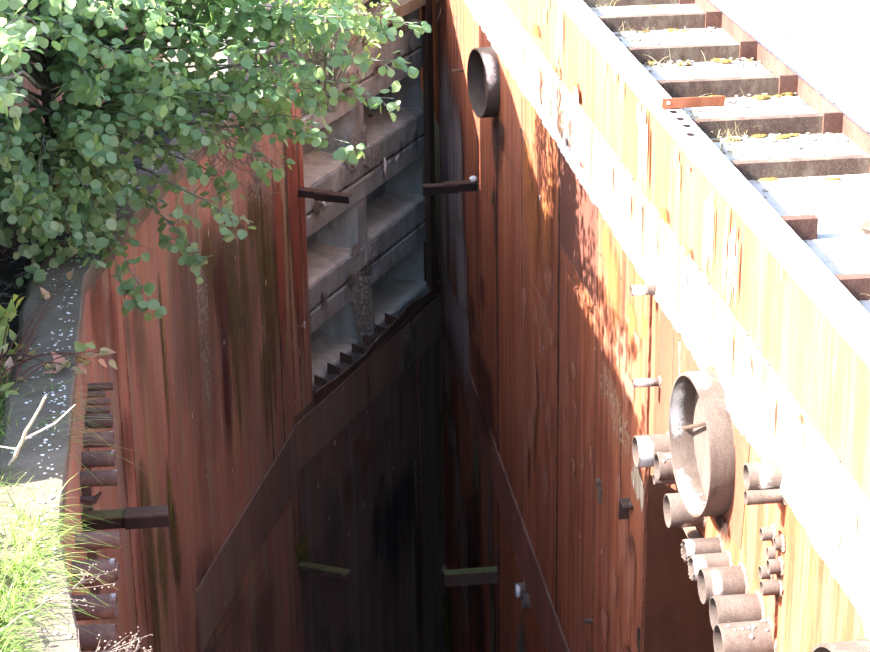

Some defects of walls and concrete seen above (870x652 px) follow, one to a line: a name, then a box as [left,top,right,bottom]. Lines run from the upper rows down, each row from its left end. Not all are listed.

water stain [469,0,620,217]
rust [214,248,232,436]
rust [523,148,552,258]
rust [603,230,617,311]
water stain [622,105,775,461]
water stain [715,515,727,539]